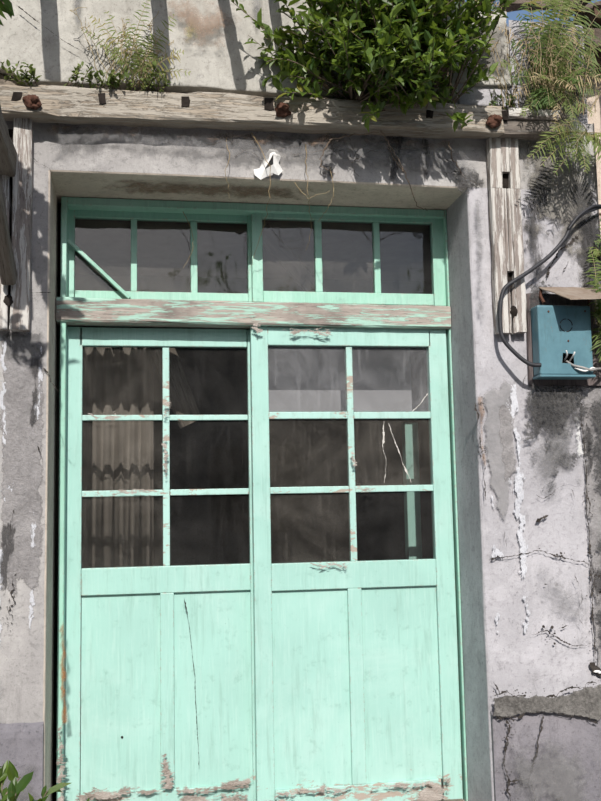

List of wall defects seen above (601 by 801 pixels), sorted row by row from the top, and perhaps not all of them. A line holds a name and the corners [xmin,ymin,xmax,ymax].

damp [524,142,601,314]
peeling [290,327,331,336]
flaking render [0,306,44,594]
damp [508,383,601,580]
crack [490,403,601,664]
crack [0,574,16,631]
damp [593,570,601,600]
peeling [75,754,253,801]
peeling [274,783,353,798]
peeling [366,777,451,801]
crack [503,716,544,801]